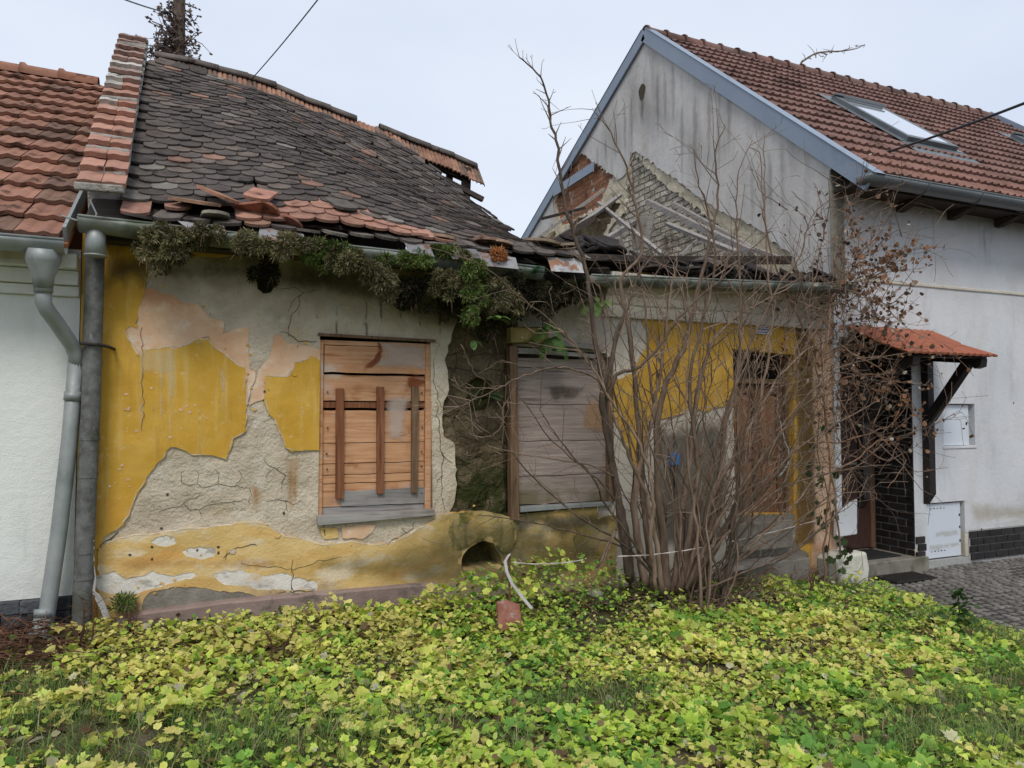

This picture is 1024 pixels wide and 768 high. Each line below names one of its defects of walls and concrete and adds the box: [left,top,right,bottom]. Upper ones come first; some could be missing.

spalling [544,152,796,274]
crack [282,287,317,348]
crack [159,460,301,517]
spalling [92,256,737,637]